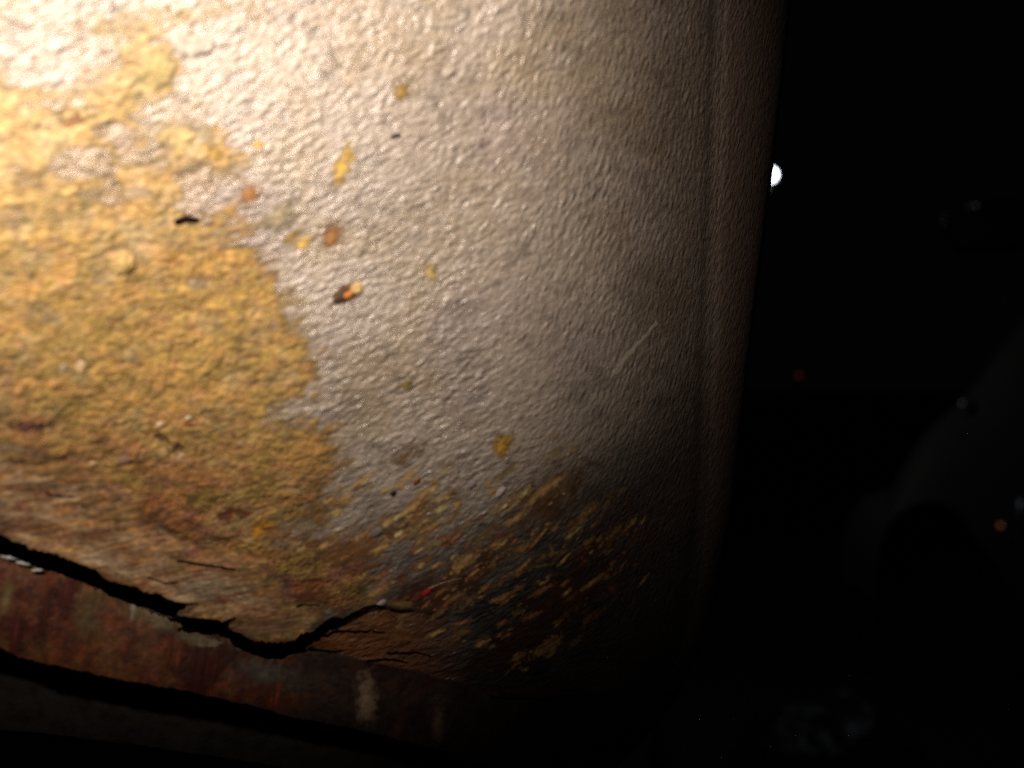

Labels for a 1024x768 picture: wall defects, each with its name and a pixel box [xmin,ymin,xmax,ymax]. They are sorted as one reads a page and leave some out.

crack [0,534,430,663]